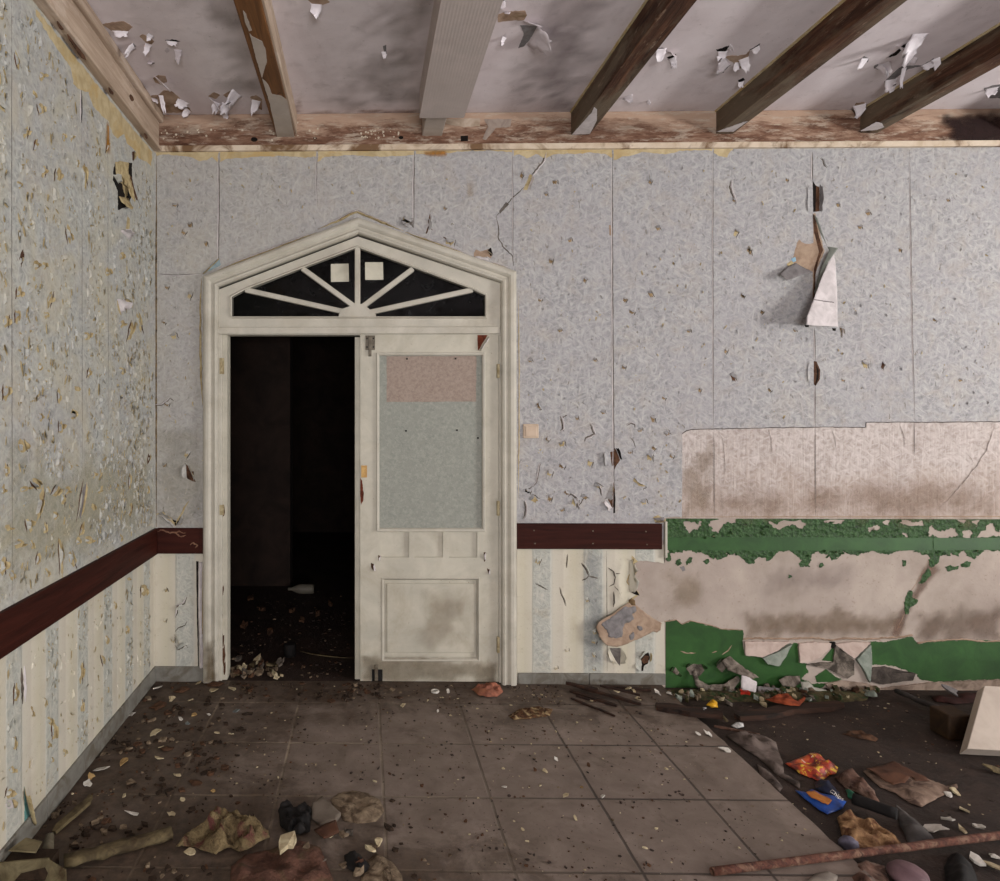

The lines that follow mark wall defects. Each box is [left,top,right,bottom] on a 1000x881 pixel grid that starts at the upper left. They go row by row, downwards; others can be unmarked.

spalling [57,21,86,60]
peeling [103,21,192,117]
peeling [209,11,295,137]
peeling [656,48,677,69]
peeling [716,44,760,88]
peeling [853,102,866,119]
peeling [857,33,941,93]
water stain [943,114,1000,140]
peeling [984,84,1000,98]
crack [496,152,547,266]
peeling [653,517,1000,614]
peeling [654,620,1000,695]